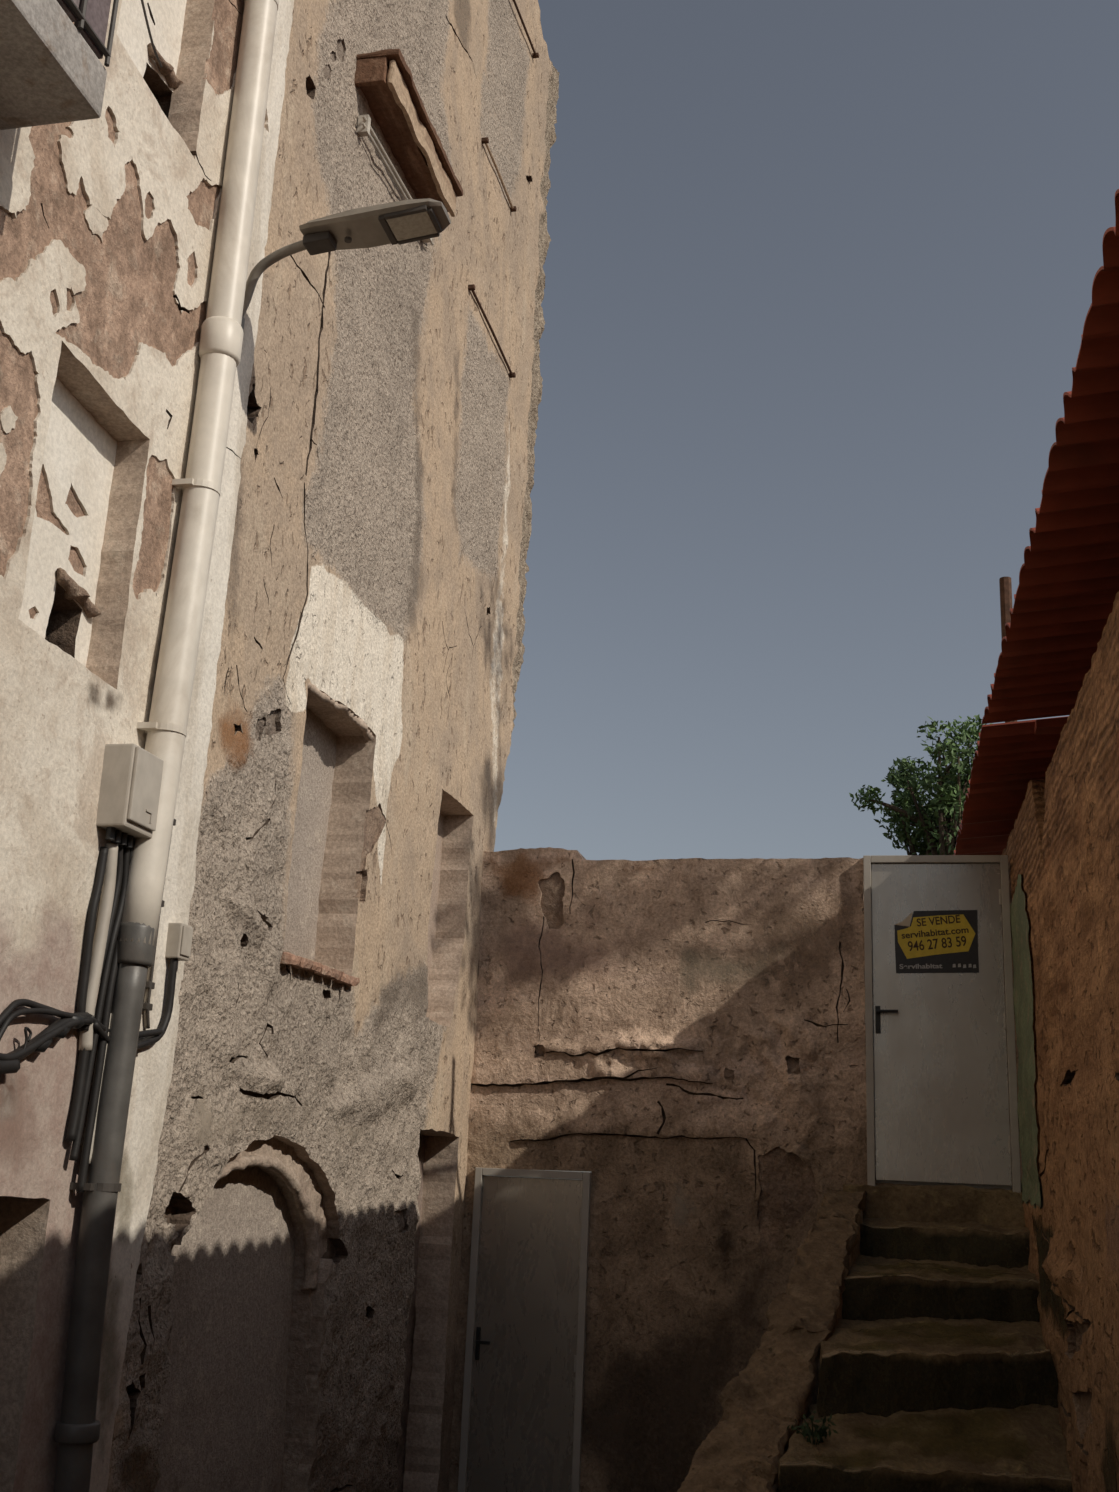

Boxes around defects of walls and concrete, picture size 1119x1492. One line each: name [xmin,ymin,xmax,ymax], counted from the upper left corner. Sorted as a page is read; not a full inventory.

peeling [105,108,117,143]
peeling [0,122,206,379]
peeling [186,180,220,230]
peeling [0,328,101,618]
peeling [132,455,174,599]
crack [224,252,331,712]
spalling [353,803,386,903]
peeling [538,872,565,929]
crack [229,965,302,1106]
crack [472,859,756,1193]
spalling [164,1192,196,1257]